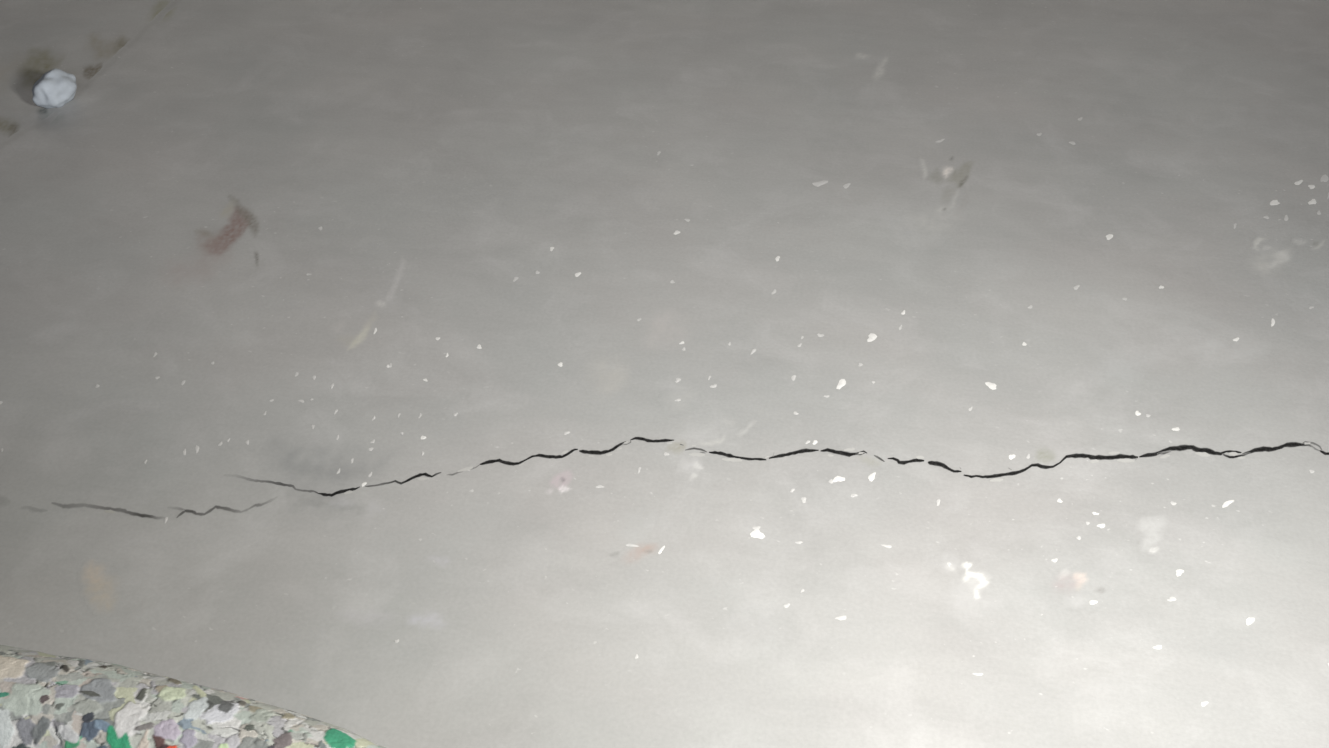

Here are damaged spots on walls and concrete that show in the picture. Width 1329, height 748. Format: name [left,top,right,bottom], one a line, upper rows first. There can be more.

crack [0,436,1329,520]